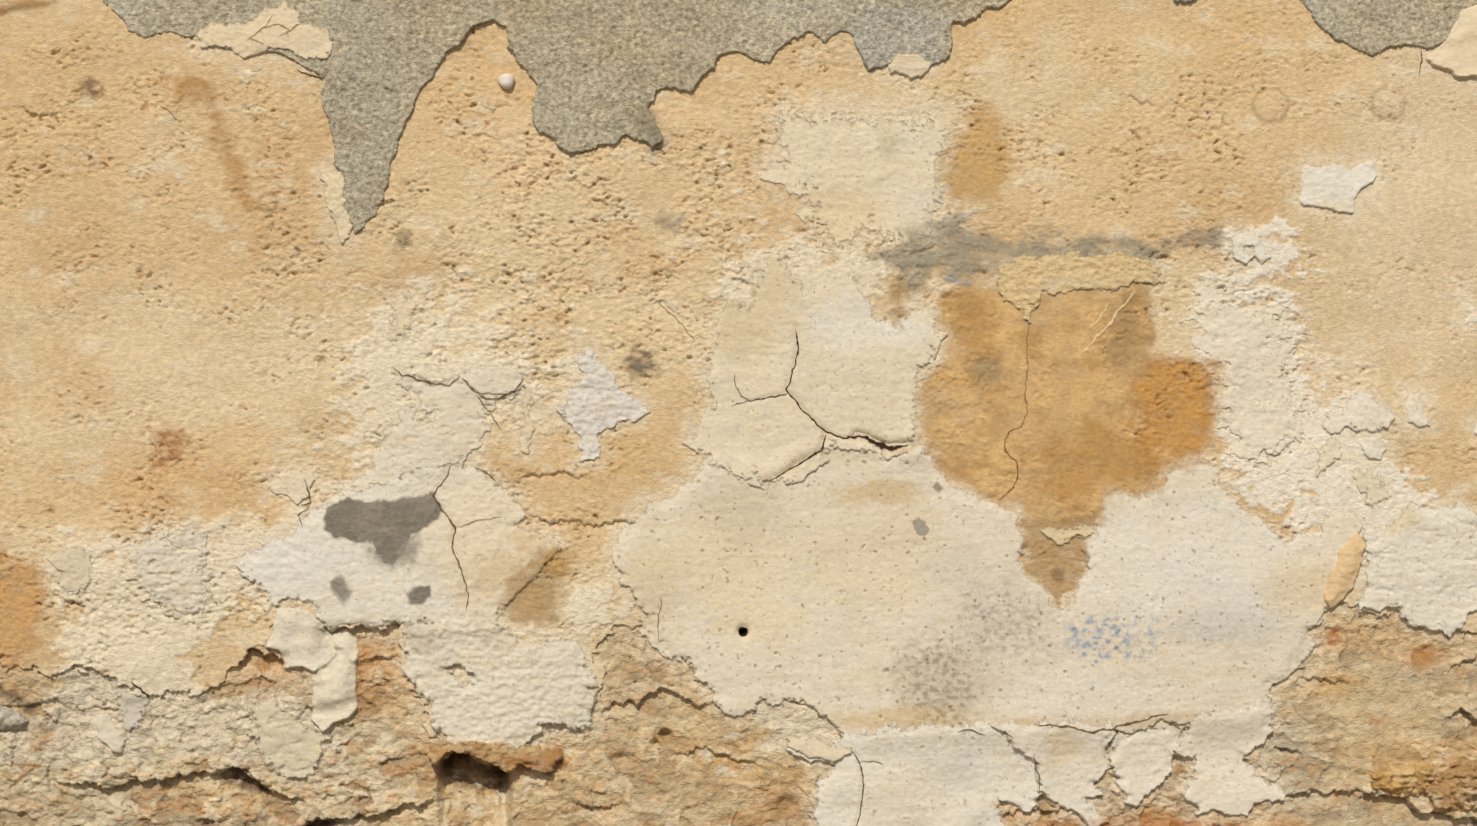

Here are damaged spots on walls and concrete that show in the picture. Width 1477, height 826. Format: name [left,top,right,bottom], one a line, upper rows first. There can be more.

peeling [1301,0,1477,78]
peeling [103,0,1009,254]
peeling [1298,161,1376,214]
crack [734,333,908,482]
crack [999,325,1029,500]
crack [432,465,502,609]
peeling [0,249,1477,826]